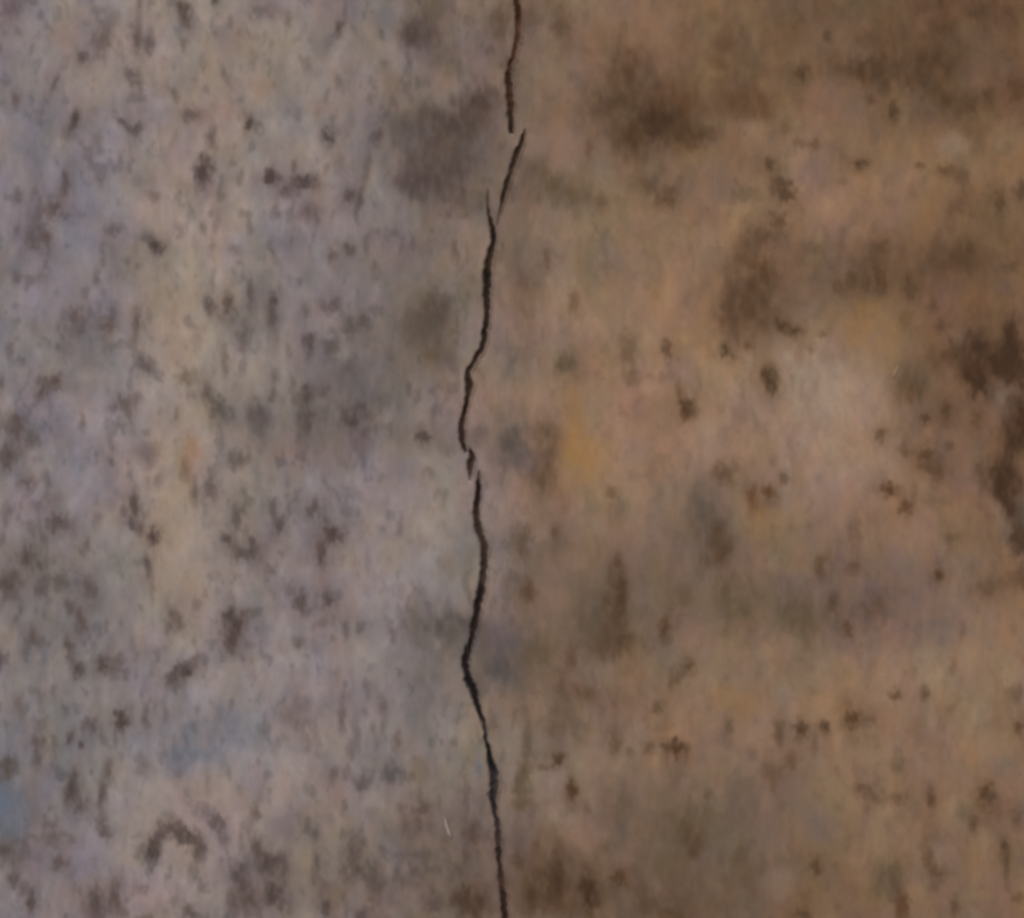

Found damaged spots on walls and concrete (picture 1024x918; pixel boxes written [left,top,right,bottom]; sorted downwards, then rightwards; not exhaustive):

crack [456,0,526,918]